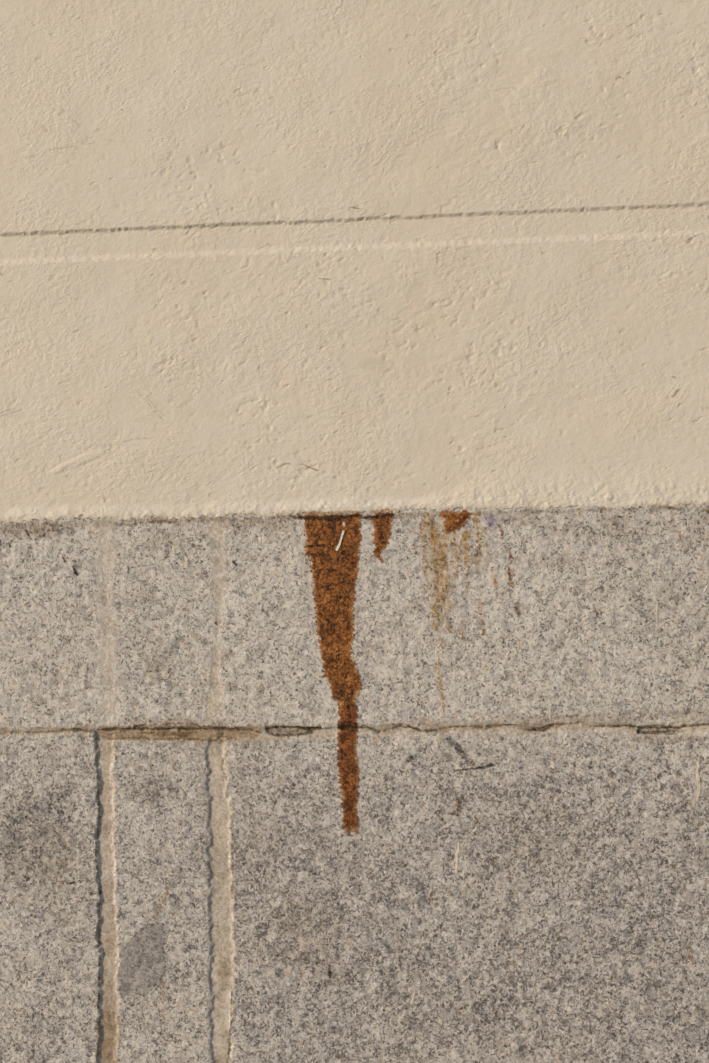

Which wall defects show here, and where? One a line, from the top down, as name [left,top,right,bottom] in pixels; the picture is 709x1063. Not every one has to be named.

crack [0,723,260,1008]
corrosion [289,509,394,836]
crack [320,721,639,733]